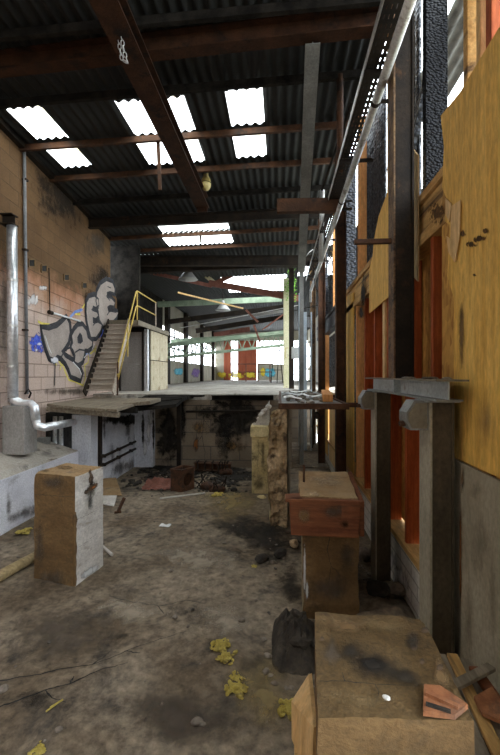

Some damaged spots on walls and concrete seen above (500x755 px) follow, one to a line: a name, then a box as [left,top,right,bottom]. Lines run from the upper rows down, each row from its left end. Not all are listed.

crack [0,631,186,707]